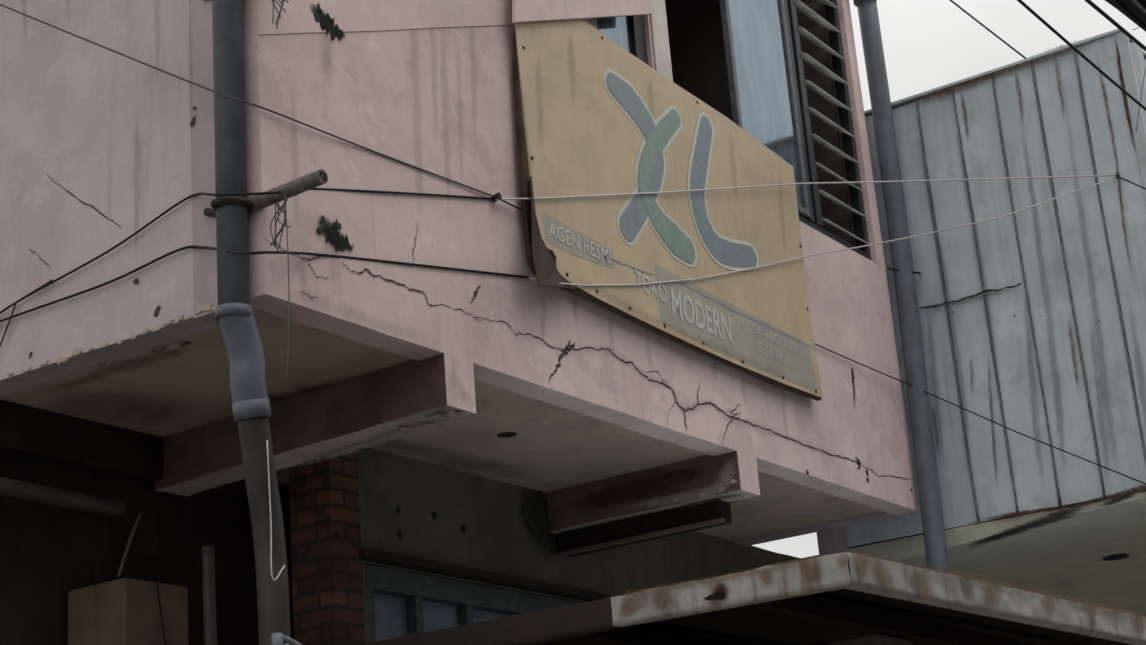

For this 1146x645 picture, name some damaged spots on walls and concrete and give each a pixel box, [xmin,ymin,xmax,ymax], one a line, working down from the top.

spalling [312,3,345,40]
crack [47,174,121,227]
spalling [316,215,353,252]
crack [266,223,915,480]
water stain [1104,493,1133,506]
water stain [973,507,1081,547]
corrosion [652,562,818,607]